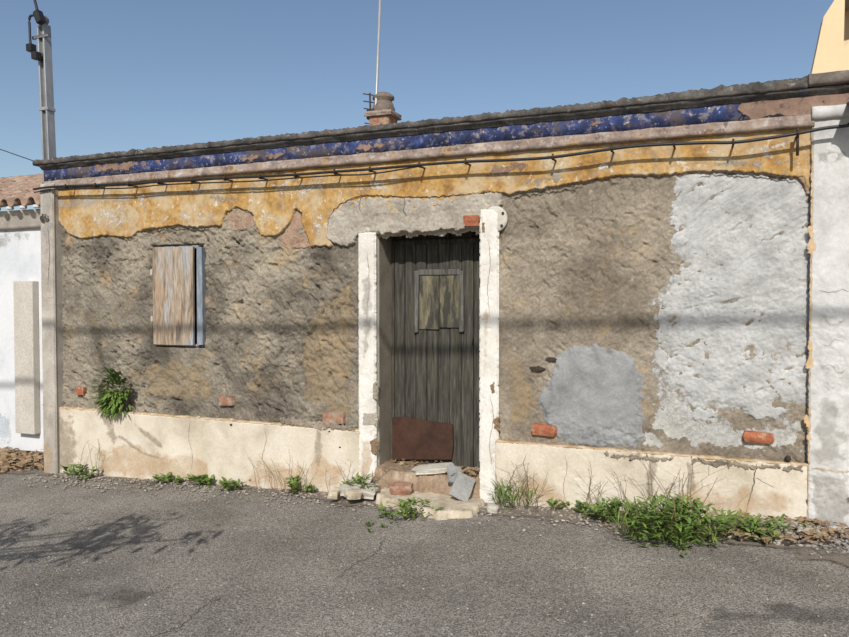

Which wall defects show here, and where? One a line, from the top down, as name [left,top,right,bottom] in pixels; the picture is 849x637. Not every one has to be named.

peeling [356,142,393,152]
peeling [241,152,283,162]
peeling [95,161,146,172]
peeling [710,142,796,200]
peeling [271,179,325,197]
flaking render [463,215,485,233]
flaking render [61,188,378,432]
flaking render [490,163,811,472]
crack [697,127,849,518]